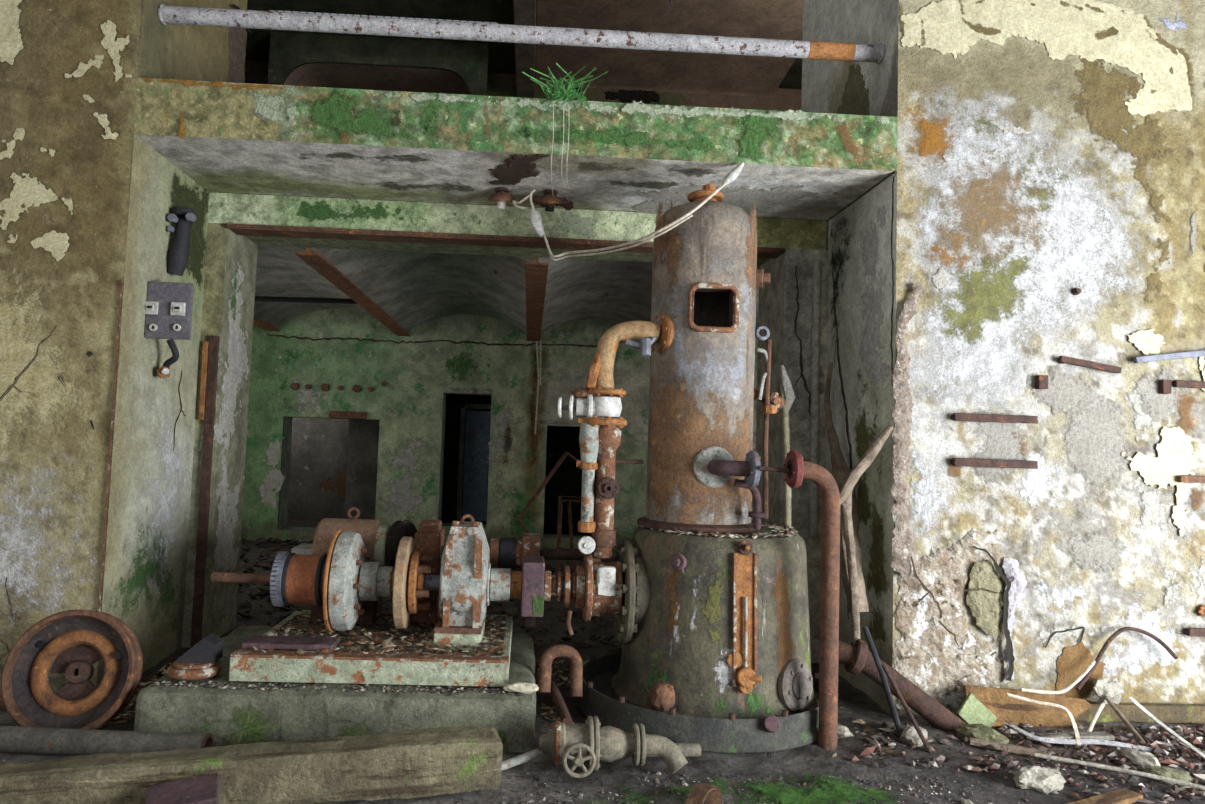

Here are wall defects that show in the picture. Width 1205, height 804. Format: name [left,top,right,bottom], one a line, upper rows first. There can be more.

peeling [0,0,23,65]
peeling [65,20,132,82]
water stain [299,152,428,163]
water stain [378,182,474,192]
water stain [578,162,713,189]
peeling [899,0,1205,223]
water stain [909,91,1141,417]
crack [0,326,66,401]
crack [794,266,811,416]
crack [832,245,857,504]
flaking render [890,267,1005,717]
peeling [1121,425,1197,536]